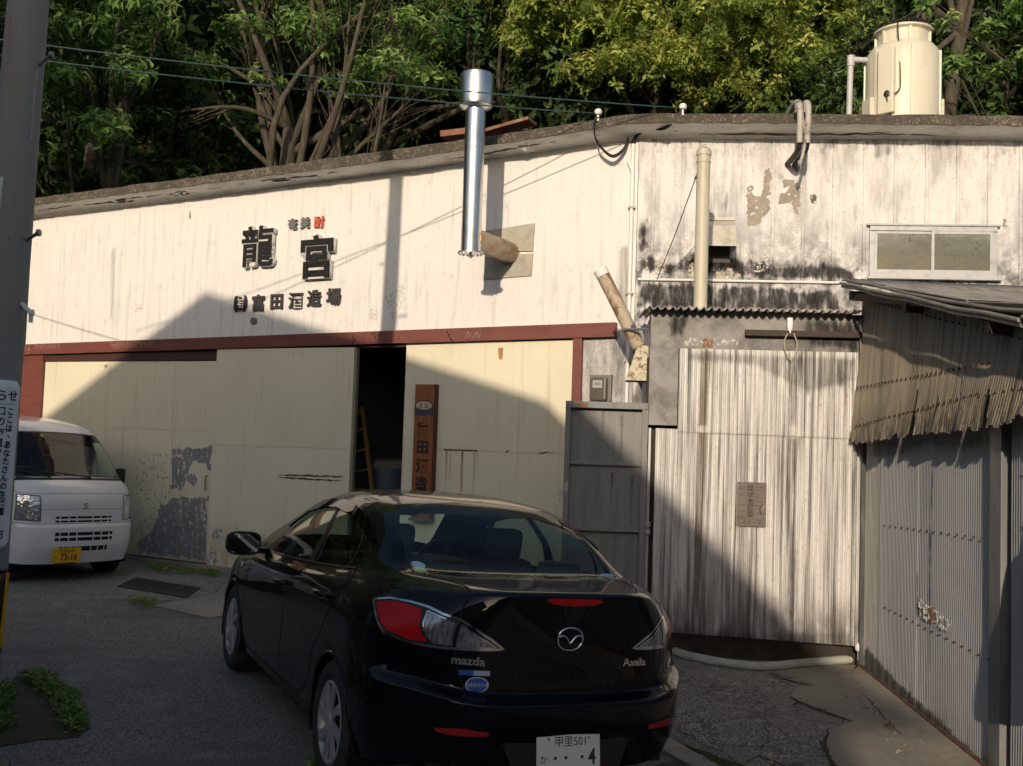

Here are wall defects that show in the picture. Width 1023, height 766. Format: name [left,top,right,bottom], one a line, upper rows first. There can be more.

peeling [746,168,817,242]
leakage [637,224,695,334]
peeling [754,241,774,272]
leakage [707,259,856,352]
peeling [135,445,235,564]
peeling [918,599,953,631]